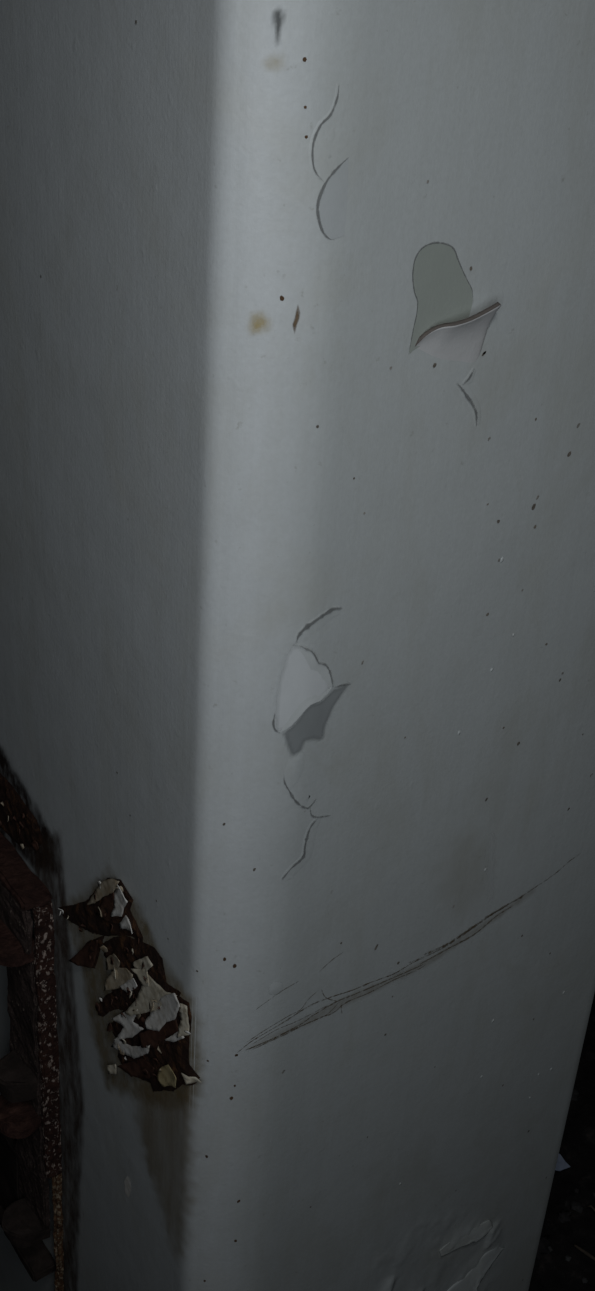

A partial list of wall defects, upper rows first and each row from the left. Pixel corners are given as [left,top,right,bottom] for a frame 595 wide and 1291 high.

peeling [409,242,501,427]
peeling [273,606,349,881]
corrosion [0,748,209,1291]